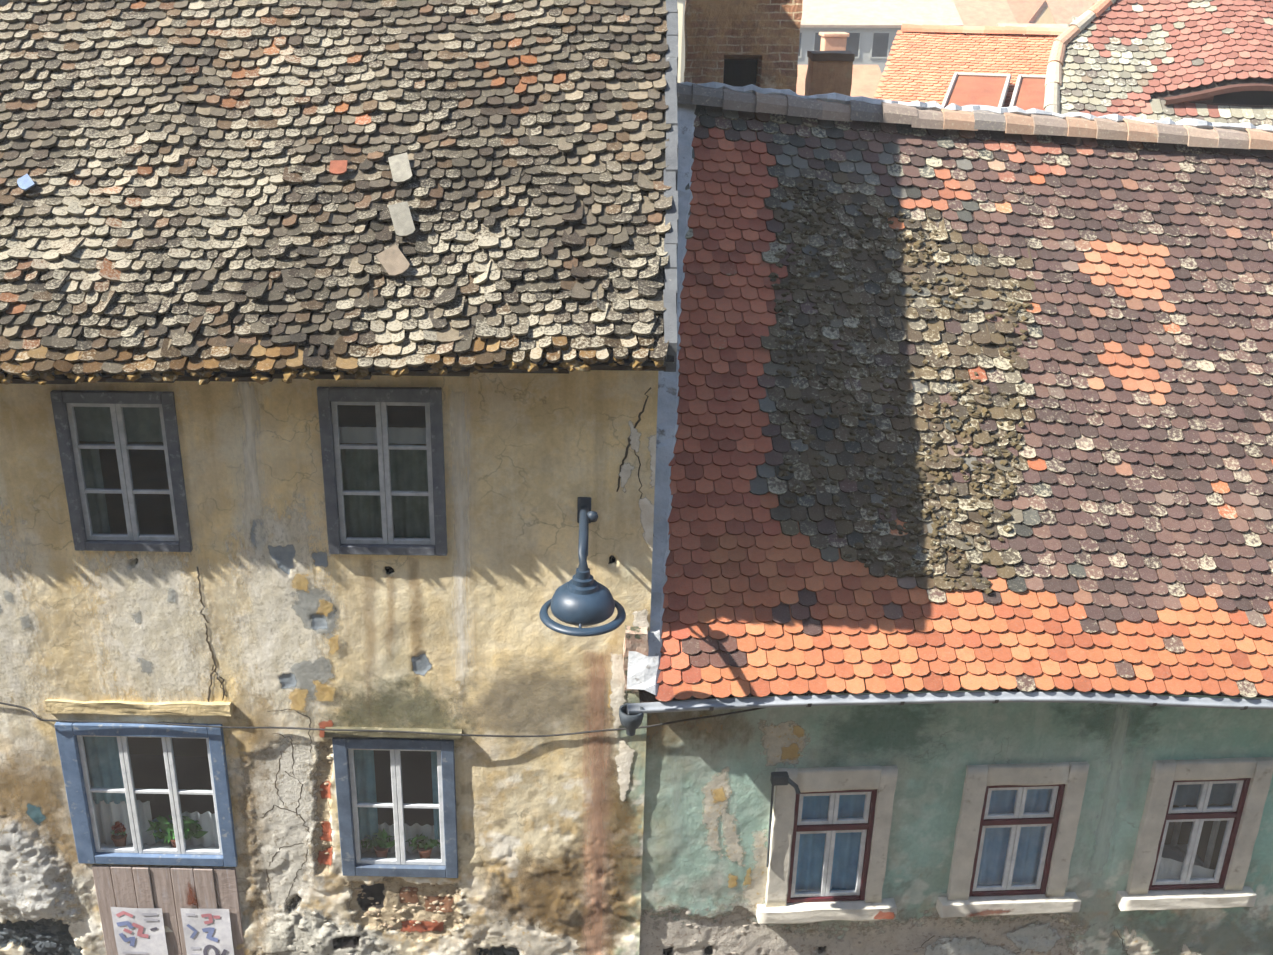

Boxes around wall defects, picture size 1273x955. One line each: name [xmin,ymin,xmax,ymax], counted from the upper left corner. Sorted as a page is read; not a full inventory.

peeling [0,502,54,710]
crack [197,567,227,702]
water stain [225,383,335,712]
peeling [250,519,339,712]
water stain [305,394,586,737]
crack [616,387,657,554]
peeling [235,736,334,927]
crack [260,709,312,907]
spalling [333,877,580,955]
spalling [639,767,1090,955]